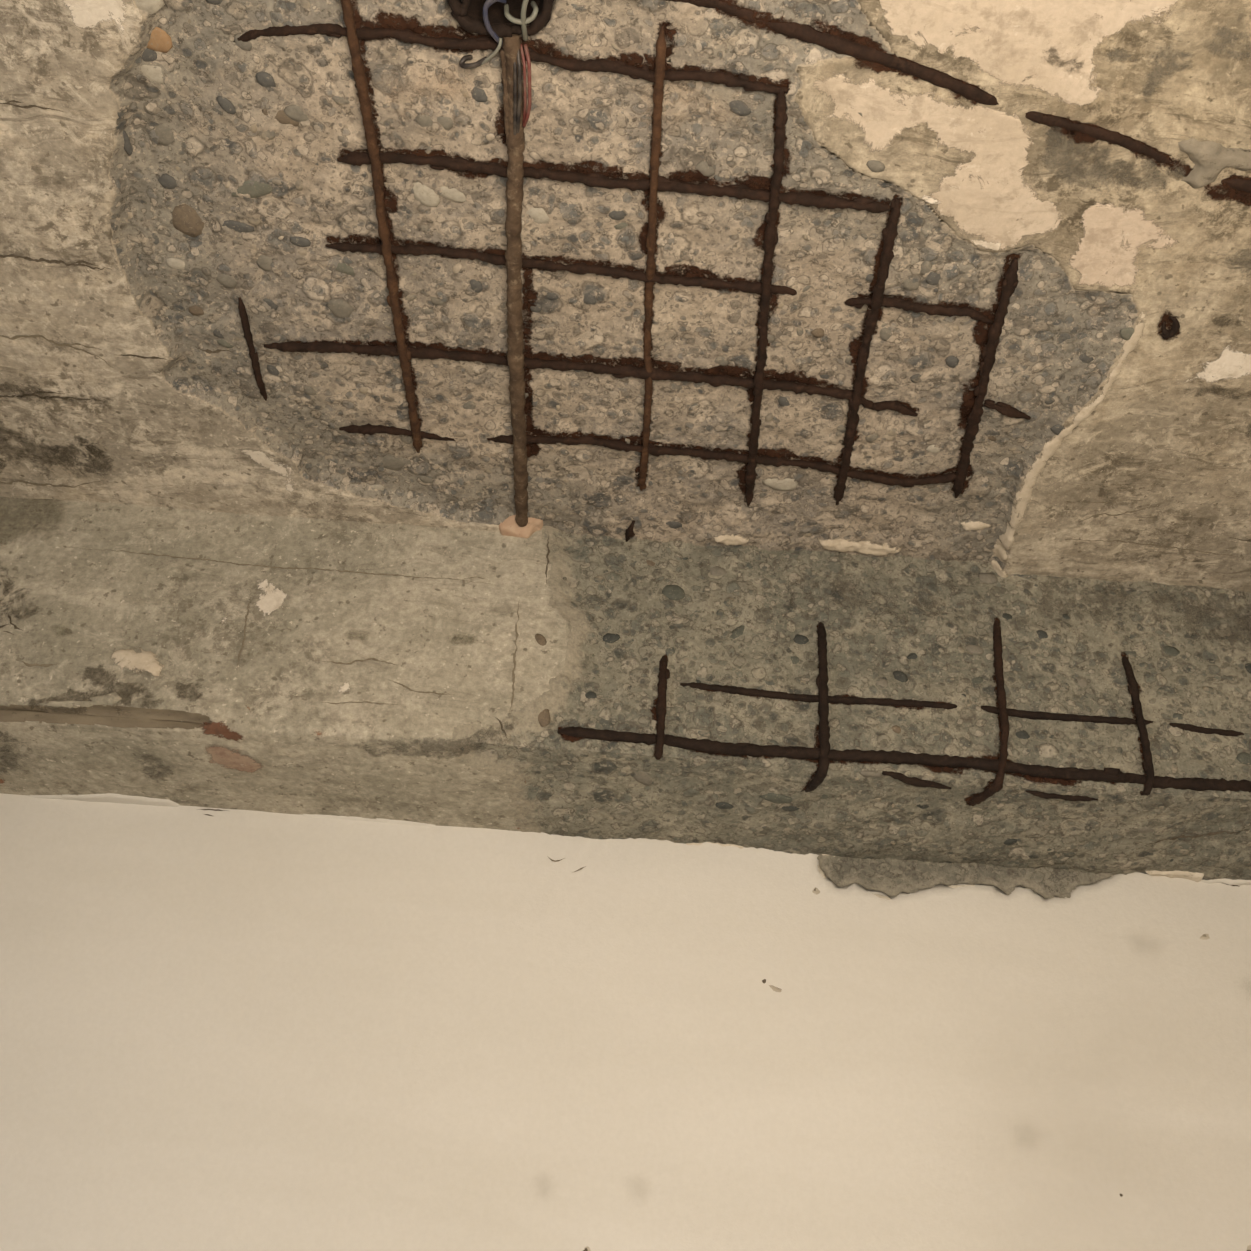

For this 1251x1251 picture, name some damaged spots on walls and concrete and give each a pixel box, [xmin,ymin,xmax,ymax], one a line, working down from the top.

rust [715,0,939,82]
rust [1036,114,1193,177]
rust [287,0,508,448]
rust [519,21,1022,502]
rust [1204,174,1251,206]
rust [1155,312,1180,342]
spalling [60,0,1251,900]
spalling [0,692,274,773]
rust [558,727,620,742]
rust [691,651,1116,806]
rust [1126,676,1146,794]
peeling [26,793,181,807]